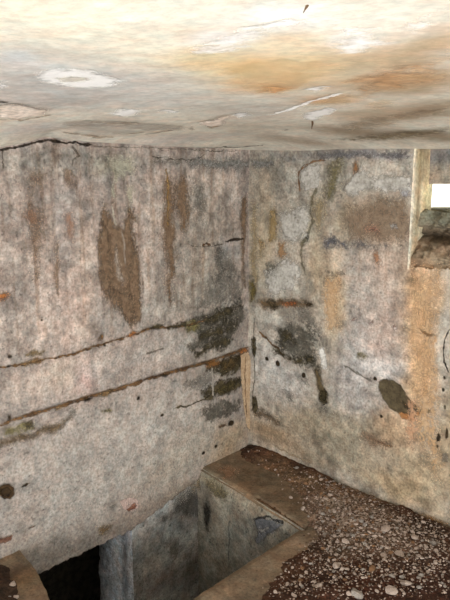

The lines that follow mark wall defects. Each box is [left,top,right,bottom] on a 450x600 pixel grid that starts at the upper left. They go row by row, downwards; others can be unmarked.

crack [0,139,263,168]
rust [350,130,445,141]
water stain [98,187,144,326]
water stain [162,168,191,303]
crack [191,238,243,247]
water stain [174,197,286,422]
rust [258,298,313,310]
water stain [259,322,328,404]
water stain [344,366,430,421]